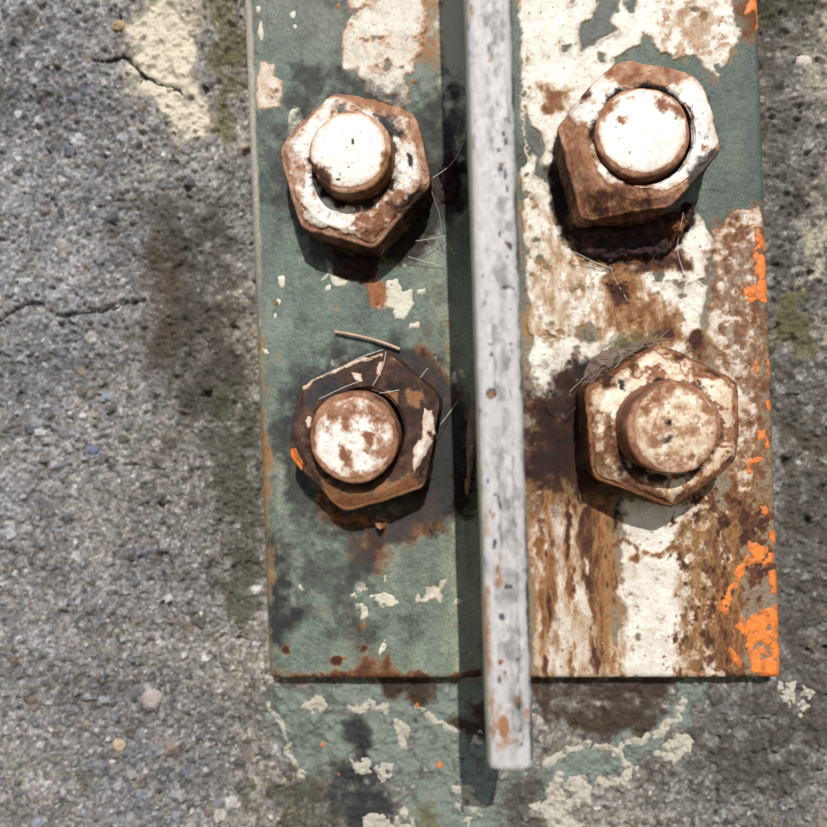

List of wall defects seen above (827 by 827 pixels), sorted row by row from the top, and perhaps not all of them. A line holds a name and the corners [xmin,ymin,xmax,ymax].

crack [91,46,192,100]
peeling [255,61,283,109]
peeling [321,263,348,291]
rust [281,95,468,309]
rust [304,345,478,574]
peeling [337,0,509,766]
peeling [498,0,742,404]
rust [523,61,777,677]
peeling [624,207,764,499]
rust [273,644,436,710]
rust [447,698,514,748]
peeling [527,491,742,688]